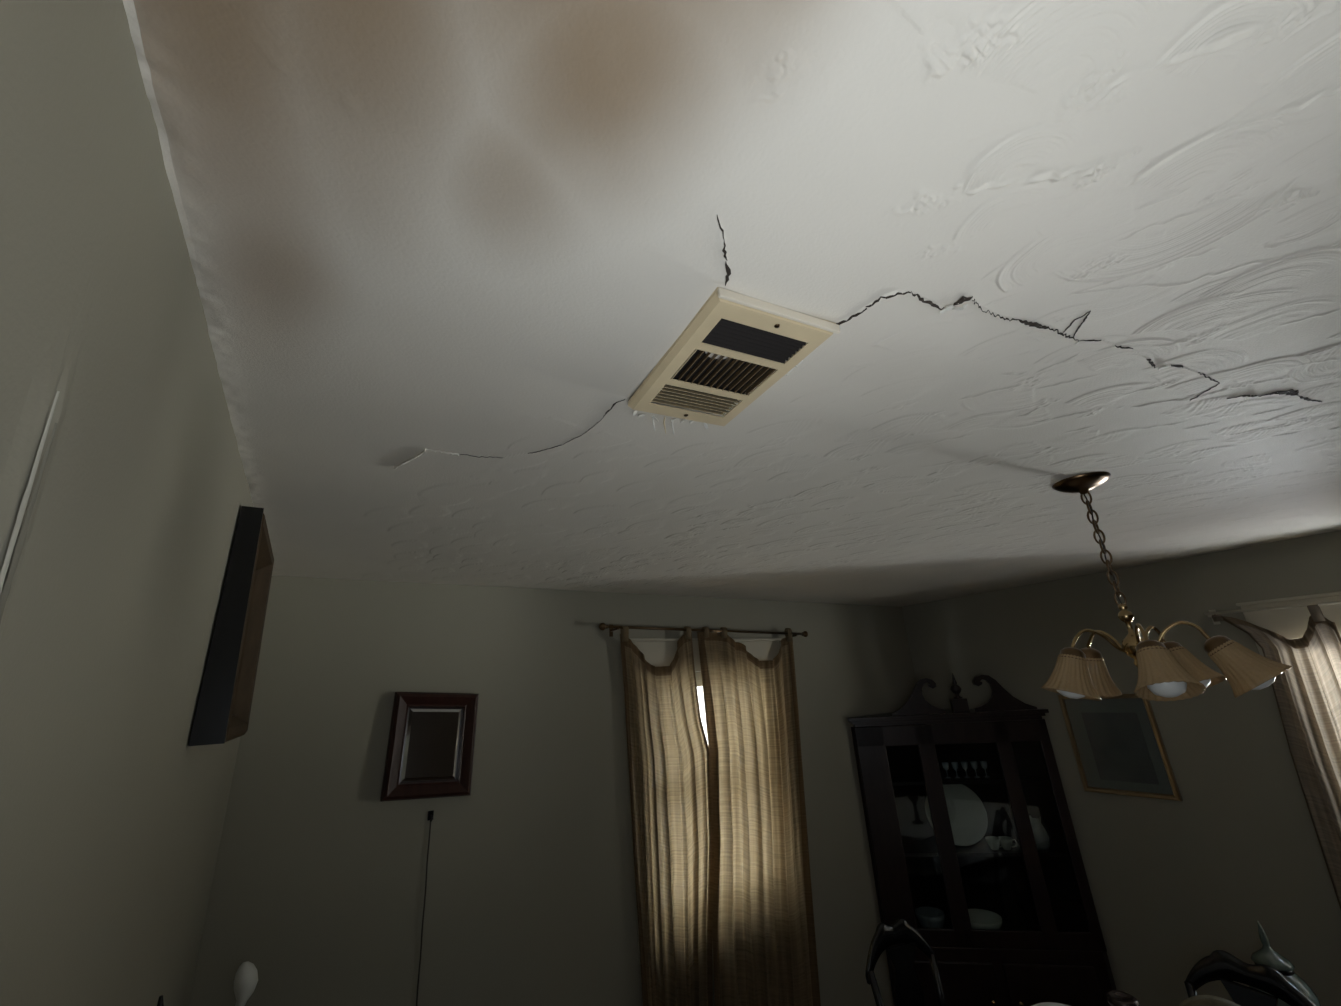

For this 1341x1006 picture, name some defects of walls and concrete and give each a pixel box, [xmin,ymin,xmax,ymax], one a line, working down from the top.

crack [836,291,1322,402]